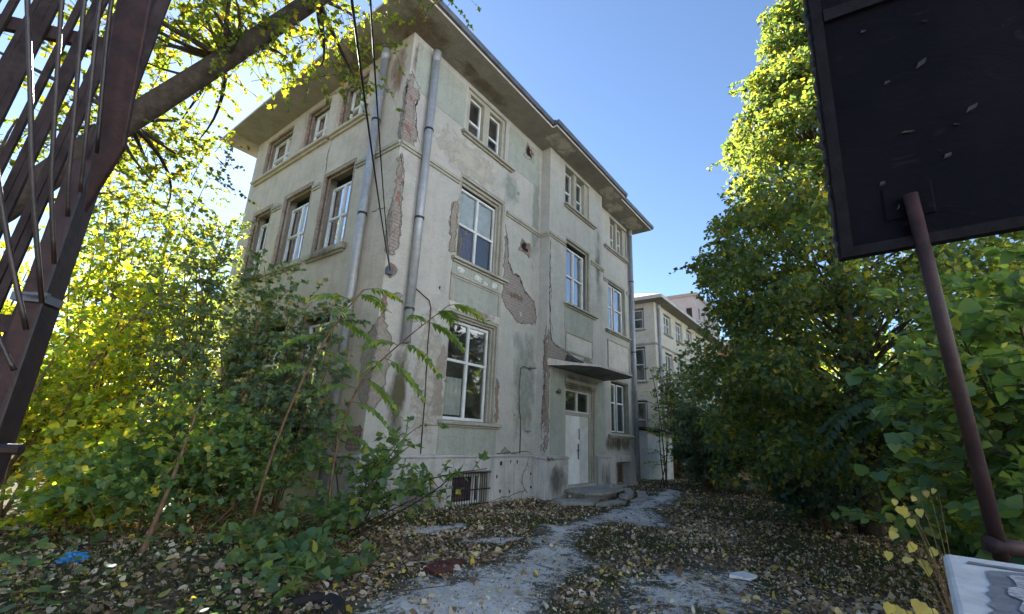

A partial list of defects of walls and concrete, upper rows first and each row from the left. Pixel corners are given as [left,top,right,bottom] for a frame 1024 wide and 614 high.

peeling [340,425,363,451]
peeling [358,72,421,409]
peeling [448,199,460,253]
peeling [457,224,570,461]